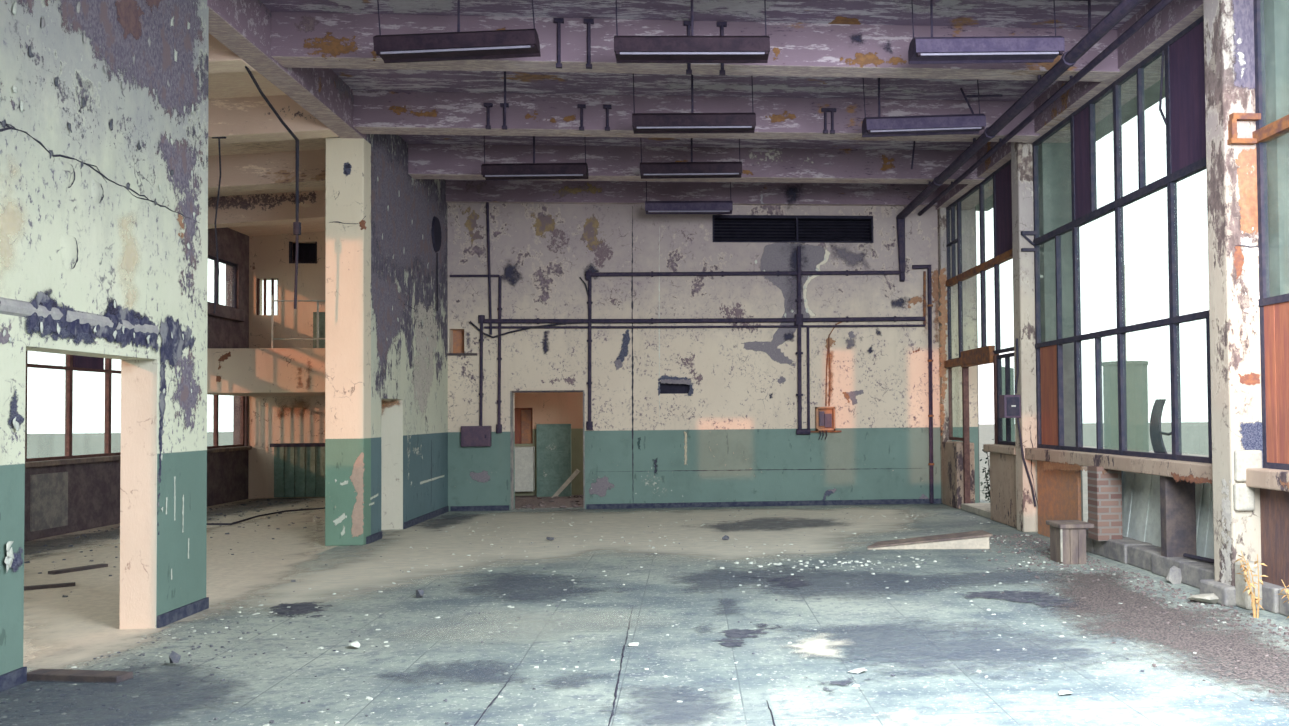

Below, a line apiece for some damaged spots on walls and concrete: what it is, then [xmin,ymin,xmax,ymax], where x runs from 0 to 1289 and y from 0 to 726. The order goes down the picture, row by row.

peeling [303,32,378,62]
peeling [666,0,776,21]
peeling [662,83,923,95]
peeling [828,16,907,68]
crack [0,119,199,223]
rust [1235,147,1258,235]
peeling [0,0,207,535]
peeling [359,137,490,485]
peeling [719,243,830,398]
peeling [846,330,881,353]
rust [1238,372,1260,386]
peeling [333,452,378,538]